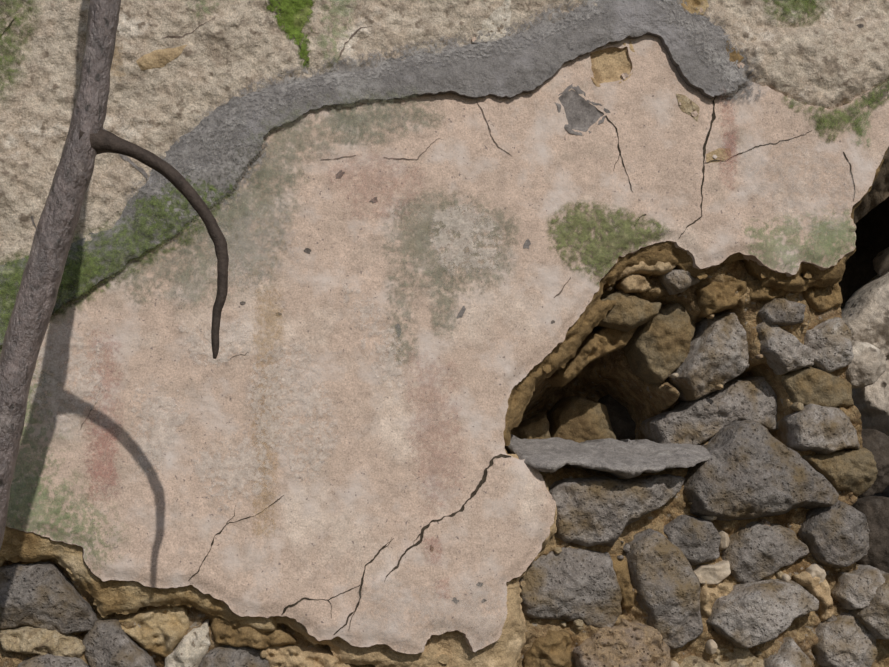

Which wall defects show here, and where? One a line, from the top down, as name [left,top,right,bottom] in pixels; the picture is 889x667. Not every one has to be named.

leakage [209,95,427,278]
peeling [471,0,511,44]
crack [477,102,512,156]
spalling [555,84,610,136]
spalling [590,41,635,88]
crack [605,115,633,192]
peeling [676,94,700,121]
crack [679,95,812,238]
spalling [503,241,856,459]
crack [188,495,284,581]
spalling [0,507,557,667]
crack [281,454,511,635]